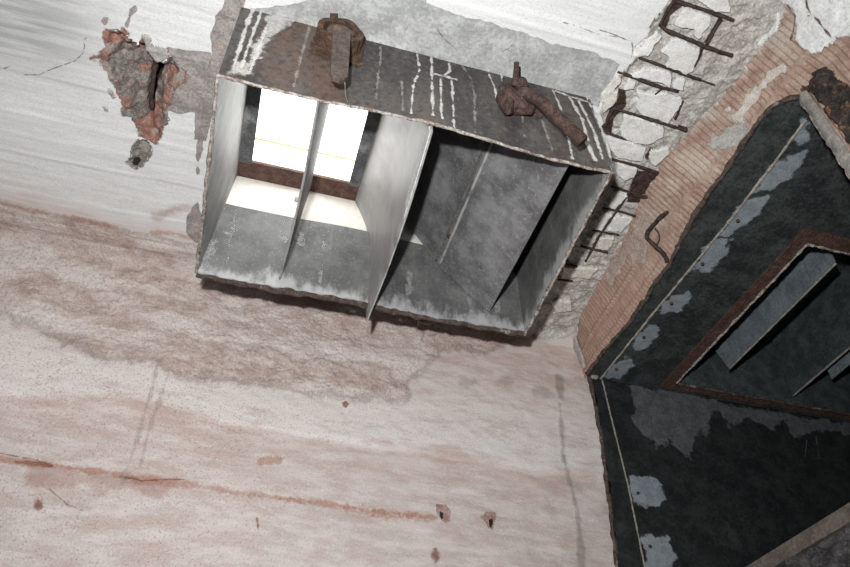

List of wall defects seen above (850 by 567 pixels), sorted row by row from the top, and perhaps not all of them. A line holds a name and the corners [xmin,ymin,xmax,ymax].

crack [4,38,86,75]
spalling [89,0,245,175]
spalling [254,0,850,343]
corrosion [800,67,850,143]